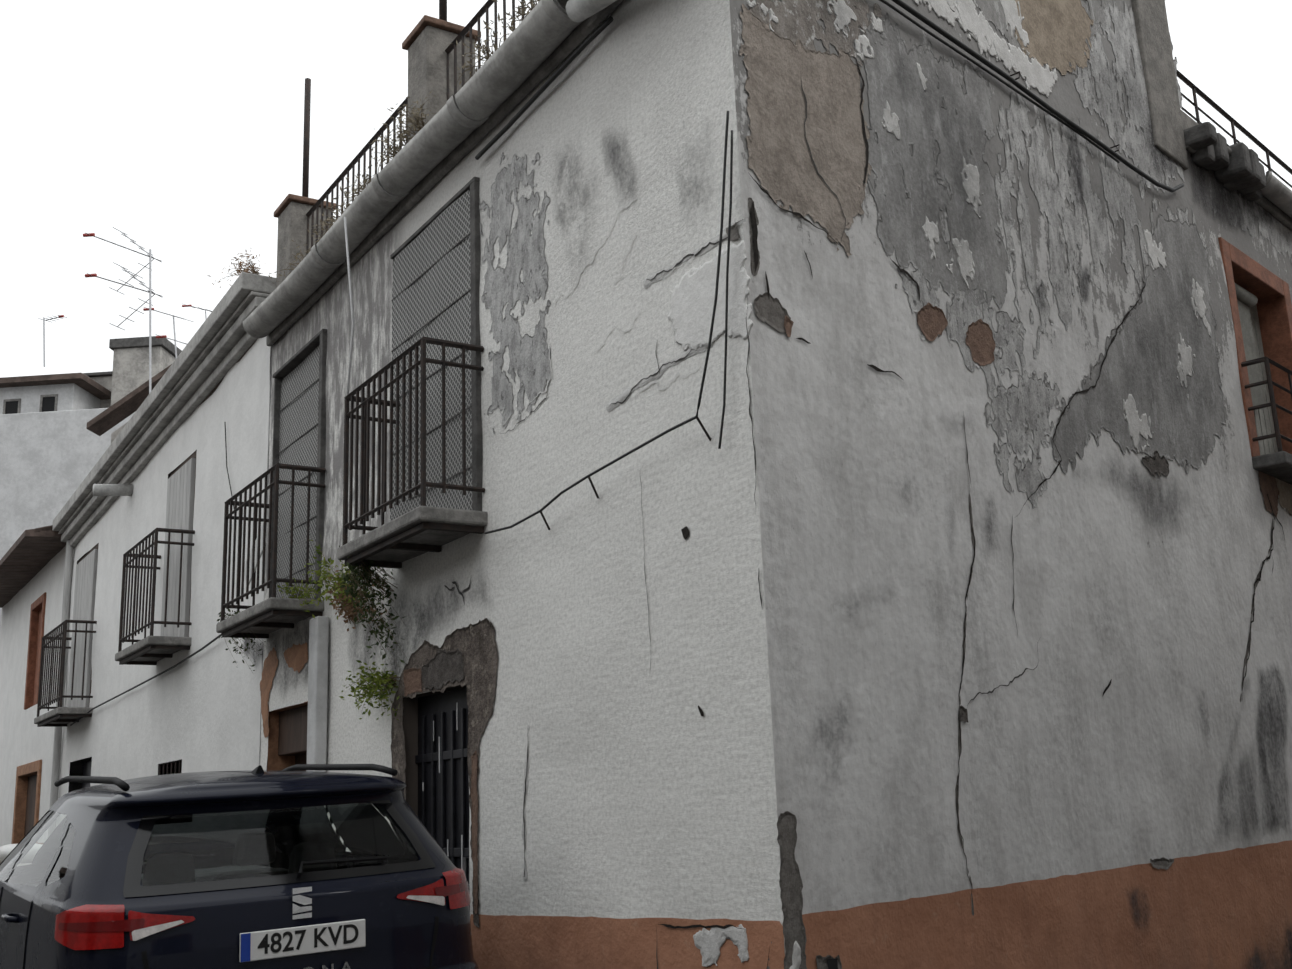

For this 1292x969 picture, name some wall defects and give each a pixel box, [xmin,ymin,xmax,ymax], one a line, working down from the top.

peeling [479,152,552,434]
crack [606,338,708,412]
crack [643,197,760,515]
peeling [739,0,1226,517]
spalling [260,642,308,738]
spalling [391,618,498,928]
crack [521,725,529,881]
peeling [658,924,749,967]
spalling [777,811,842,969]
crack [955,411,1039,916]
water stain [1224,669,1286,831]
crack [1240,494,1285,702]